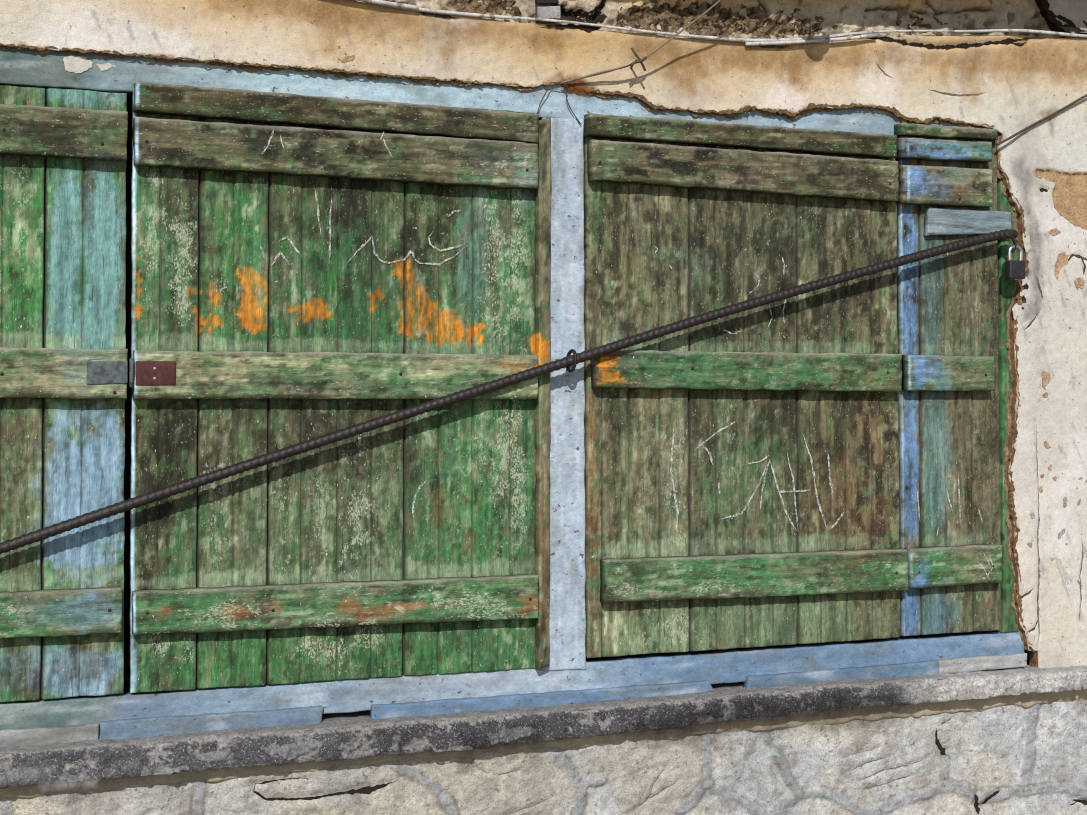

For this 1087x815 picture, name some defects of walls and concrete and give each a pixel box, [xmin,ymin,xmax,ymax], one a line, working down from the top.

flaking render [0,43,541,88]
spalling [1035,168,1087,230]
spalling [1054,252,1069,279]
flaking render [999,161,1035,645]